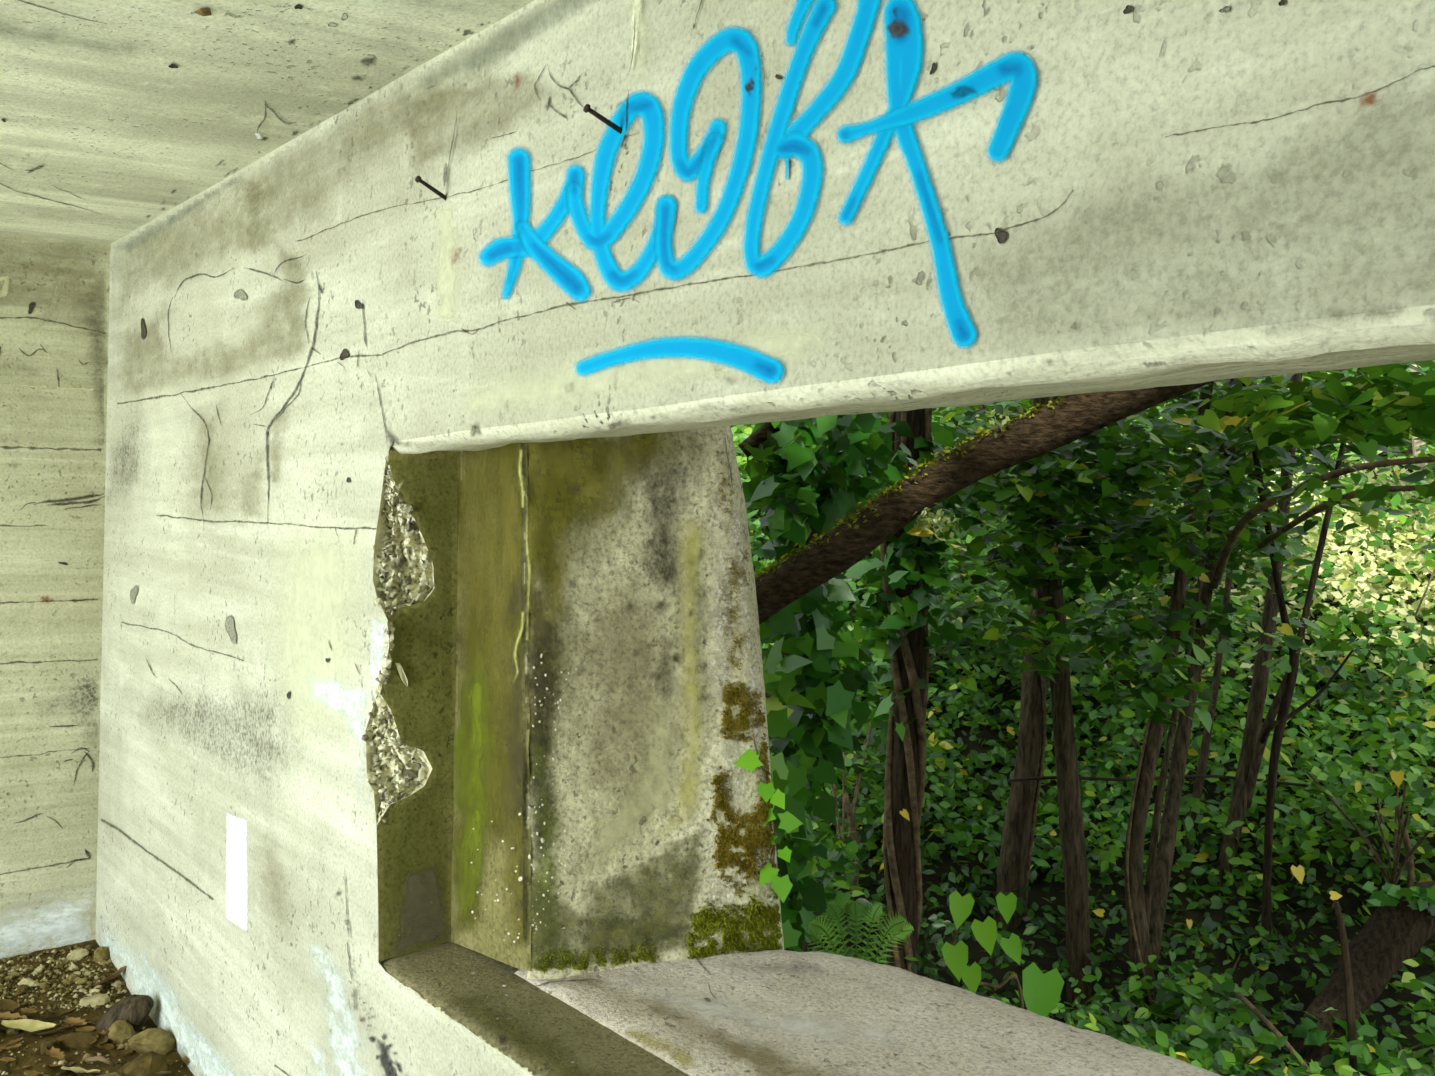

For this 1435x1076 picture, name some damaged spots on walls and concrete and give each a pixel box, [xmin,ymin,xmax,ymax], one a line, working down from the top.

crack [168,254,387,524]
spalling [362,454,434,825]
damp [0,903,84,954]